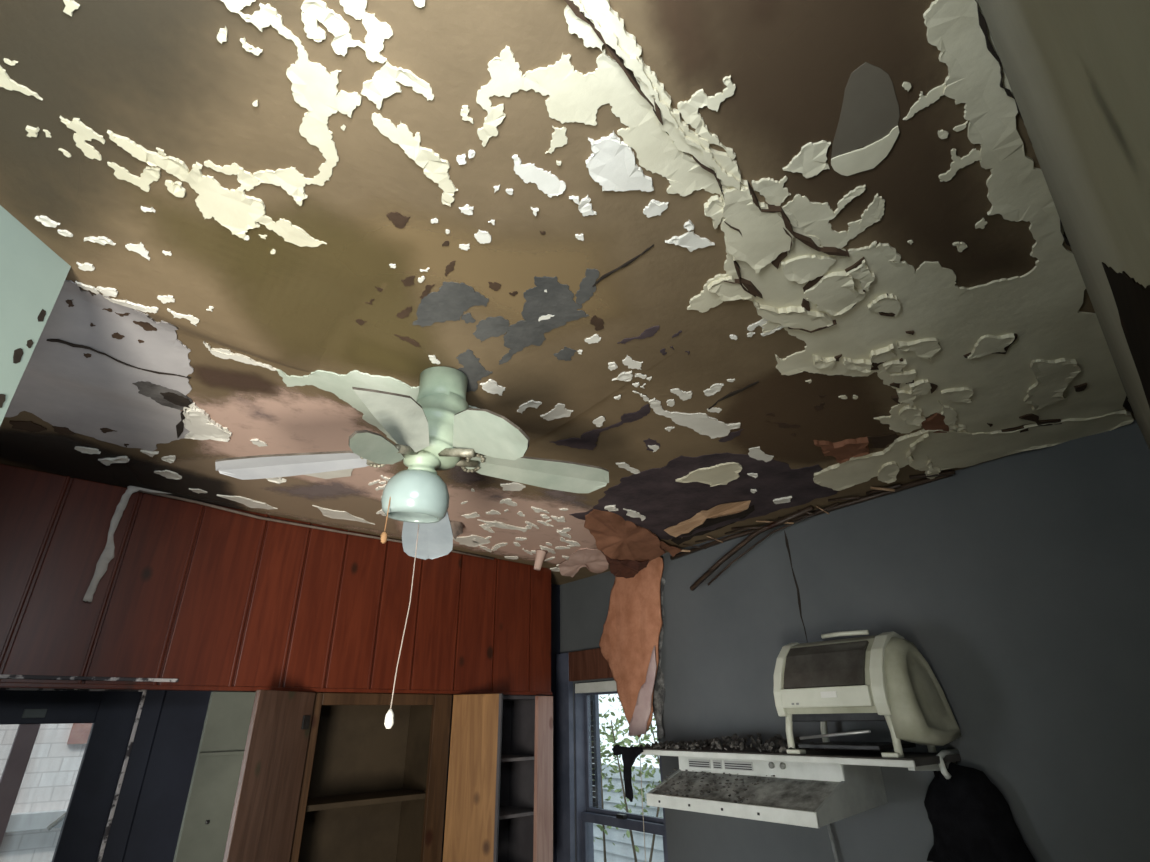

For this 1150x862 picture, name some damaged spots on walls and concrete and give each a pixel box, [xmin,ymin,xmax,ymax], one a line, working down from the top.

crack [564,0,663,125]
damp [702,0,1011,272]
crack [46,339,191,379]
crack [176,409,187,438]
damp [169,215,616,376]
peeling [0,0,1134,571]
crack [592,244,654,287]
crack [708,381,759,410]
crack [692,155,849,299]
crack [788,319,837,333]
flaking render [1102,262,1150,408]
crack [784,530,808,643]